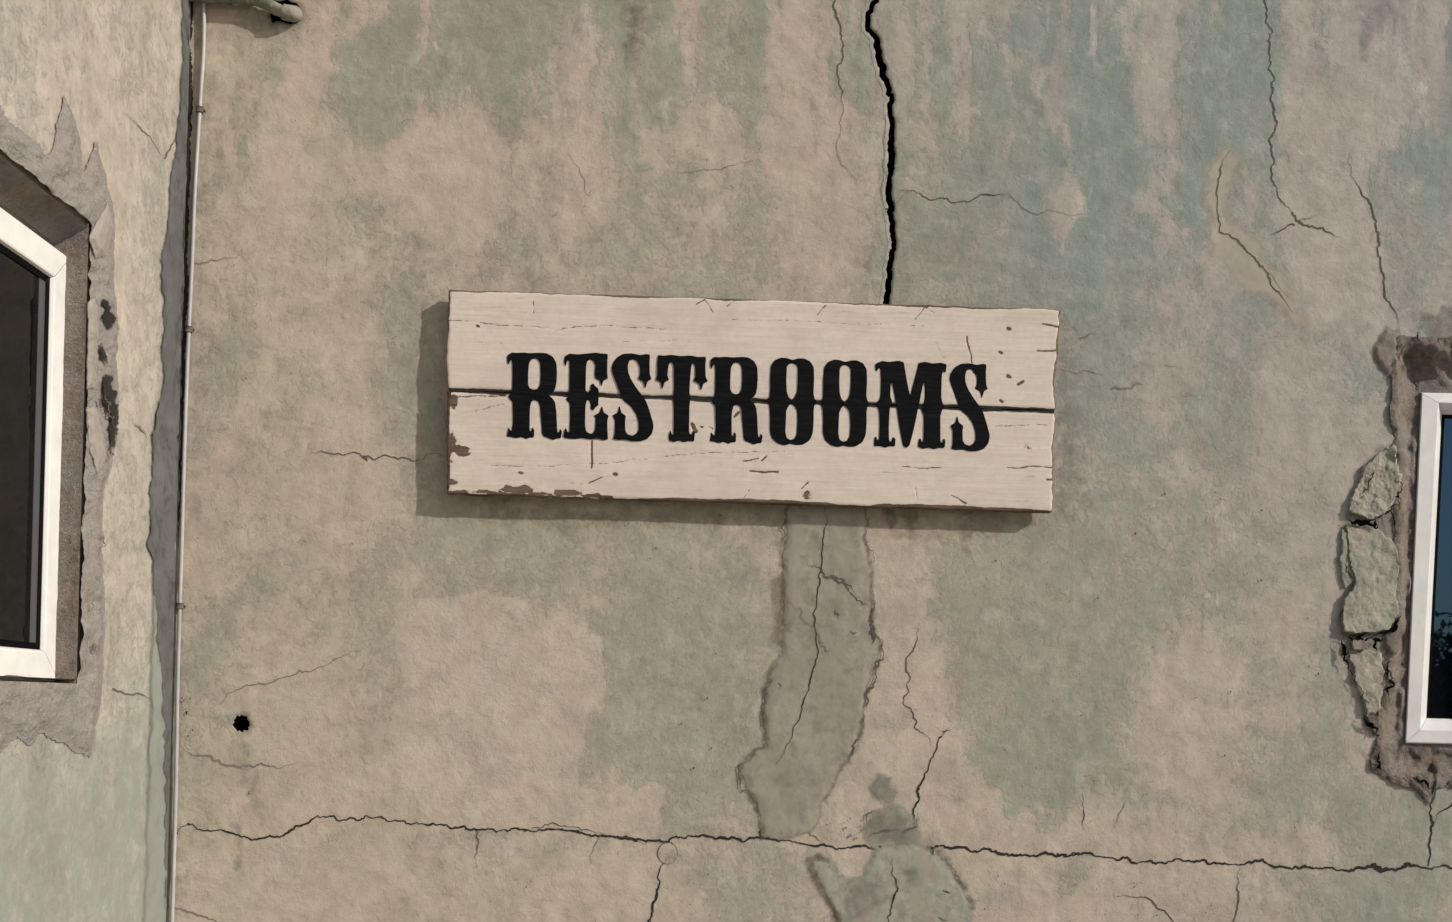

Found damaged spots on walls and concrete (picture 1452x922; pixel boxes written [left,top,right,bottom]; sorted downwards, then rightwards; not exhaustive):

peeling [90,202,114,258]
crack [833,0,1076,304]
crack [1215,0,1337,309]
crack [1348,152,1399,328]
spalling [86,295,119,473]
spalling [1373,327,1452,377]
crack [188,752,286,769]
crack [223,650,361,702]
crack [903,628,1452,922]
spalling [1338,445,1452,796]
crack [175,815,899,922]